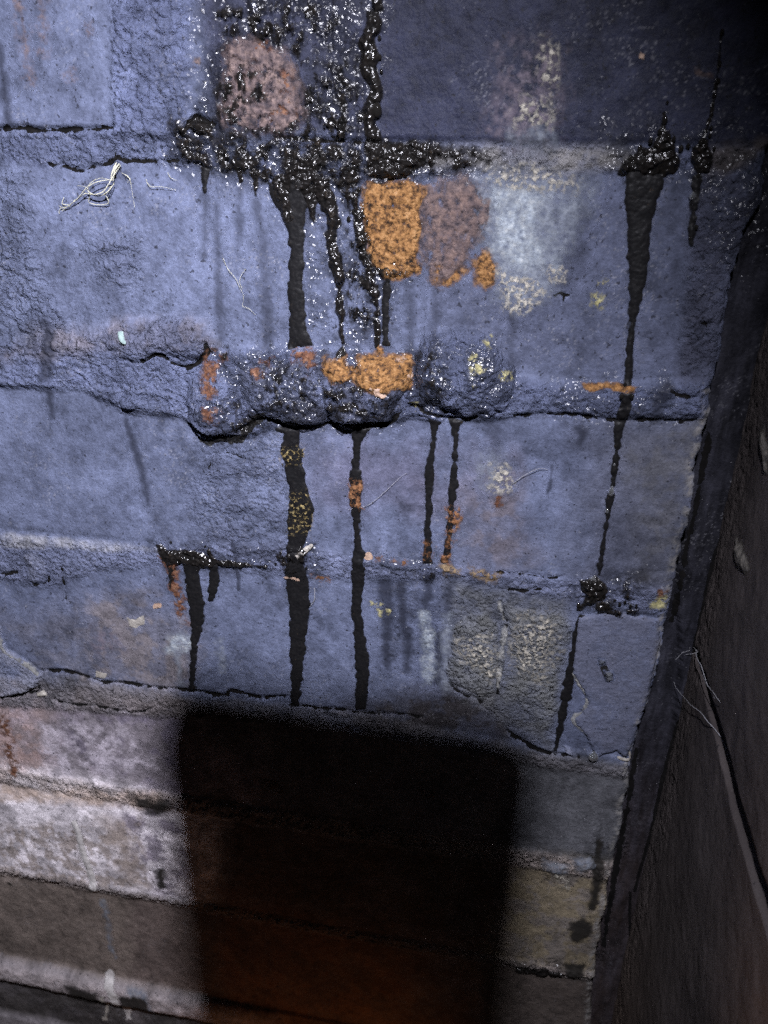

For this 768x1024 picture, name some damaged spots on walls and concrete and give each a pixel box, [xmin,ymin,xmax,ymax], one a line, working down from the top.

leakage [201,166,210,193]
leakage [236,168,392,358]
rust [360,175,499,288]
leakage [688,174,703,246]
rust [200,350,224,421]
rust [291,345,413,399]
rust [583,382,635,393]
leakage [596,171,664,575]
leakage [275,423,314,707]
leakage [339,423,391,709]
leakage [422,417,463,582]
leakage [554,614,585,751]